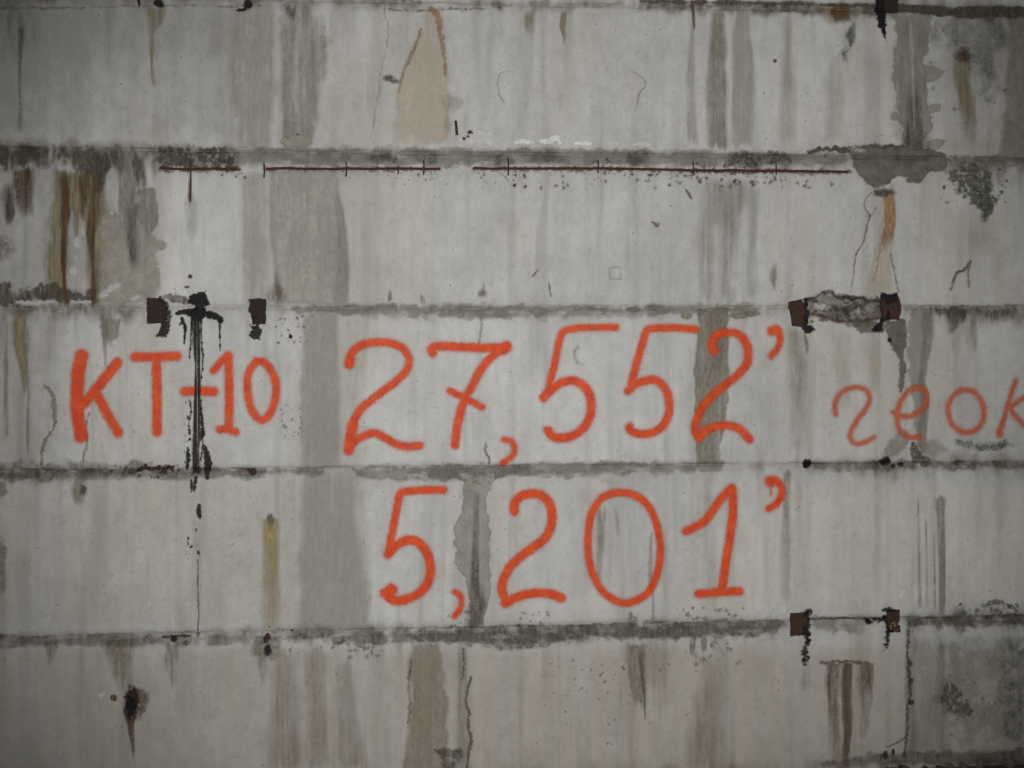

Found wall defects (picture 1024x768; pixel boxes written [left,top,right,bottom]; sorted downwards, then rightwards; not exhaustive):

corrosion [48,168,104,306]
corrosion [869,189,895,288]
spalling [807,291,881,326]